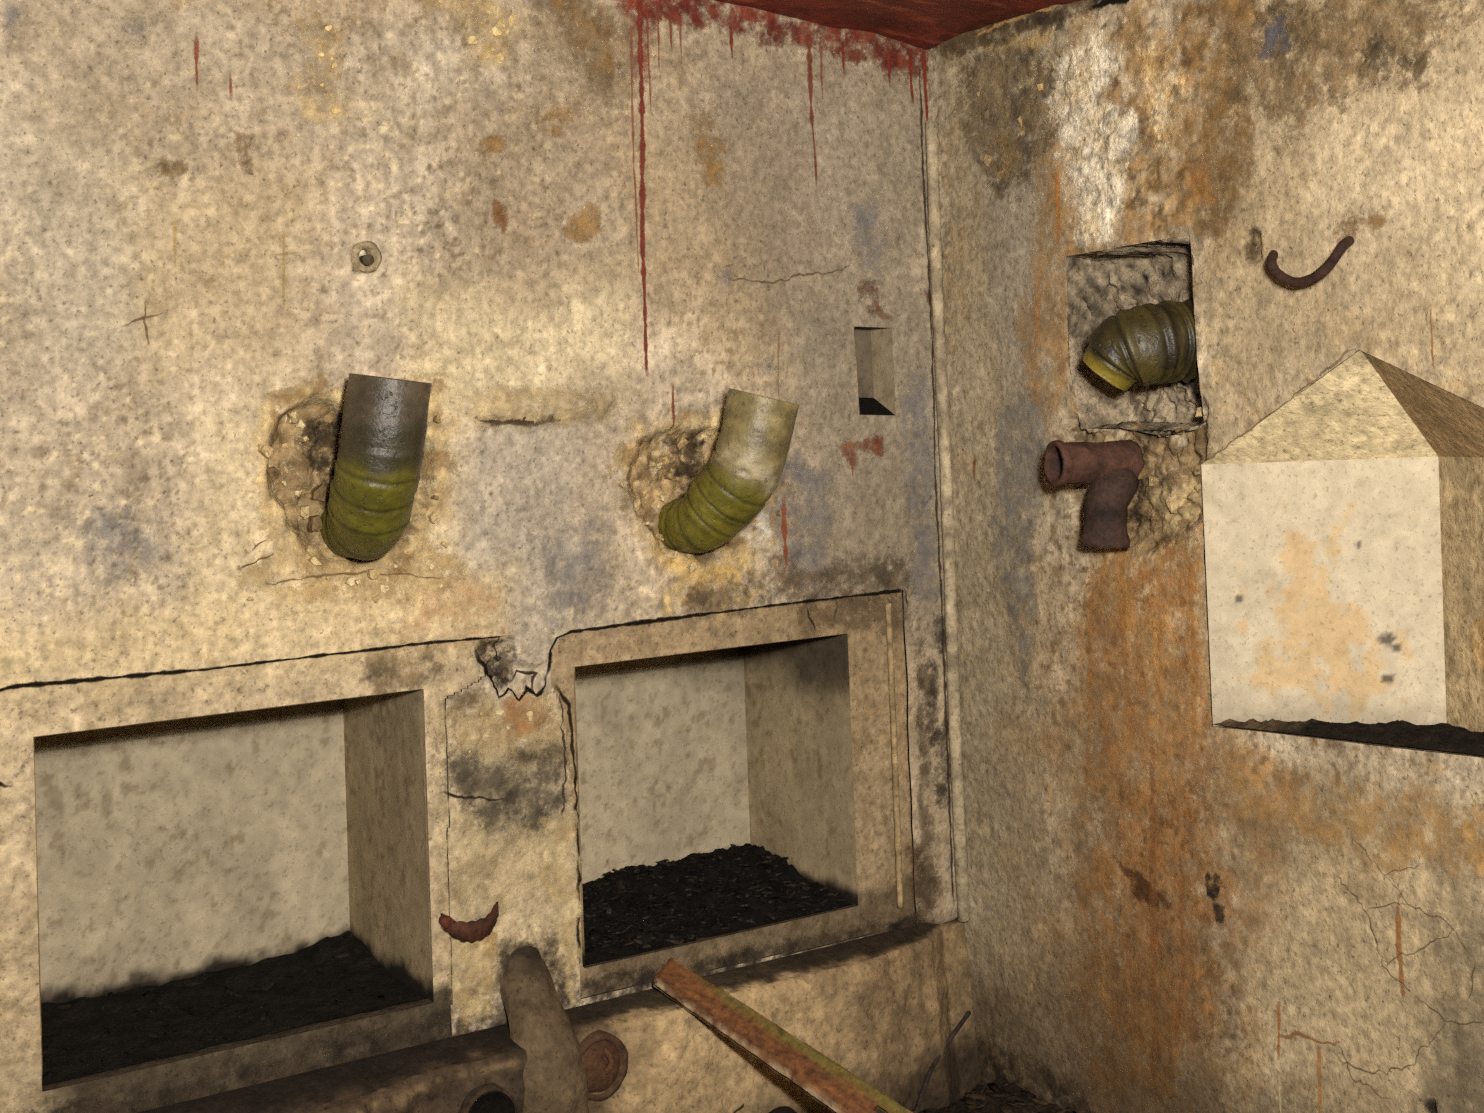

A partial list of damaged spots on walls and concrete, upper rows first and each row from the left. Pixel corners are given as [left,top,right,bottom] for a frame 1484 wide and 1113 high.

rust [618,0,929,371]
water stain [978,5,1058,36]
water stain [1092,0,1129,8]
water stain [1174,0,1462,236]
spalling [242,373,462,603]
spalling [608,406,790,618]
spalling [476,638,517,688]